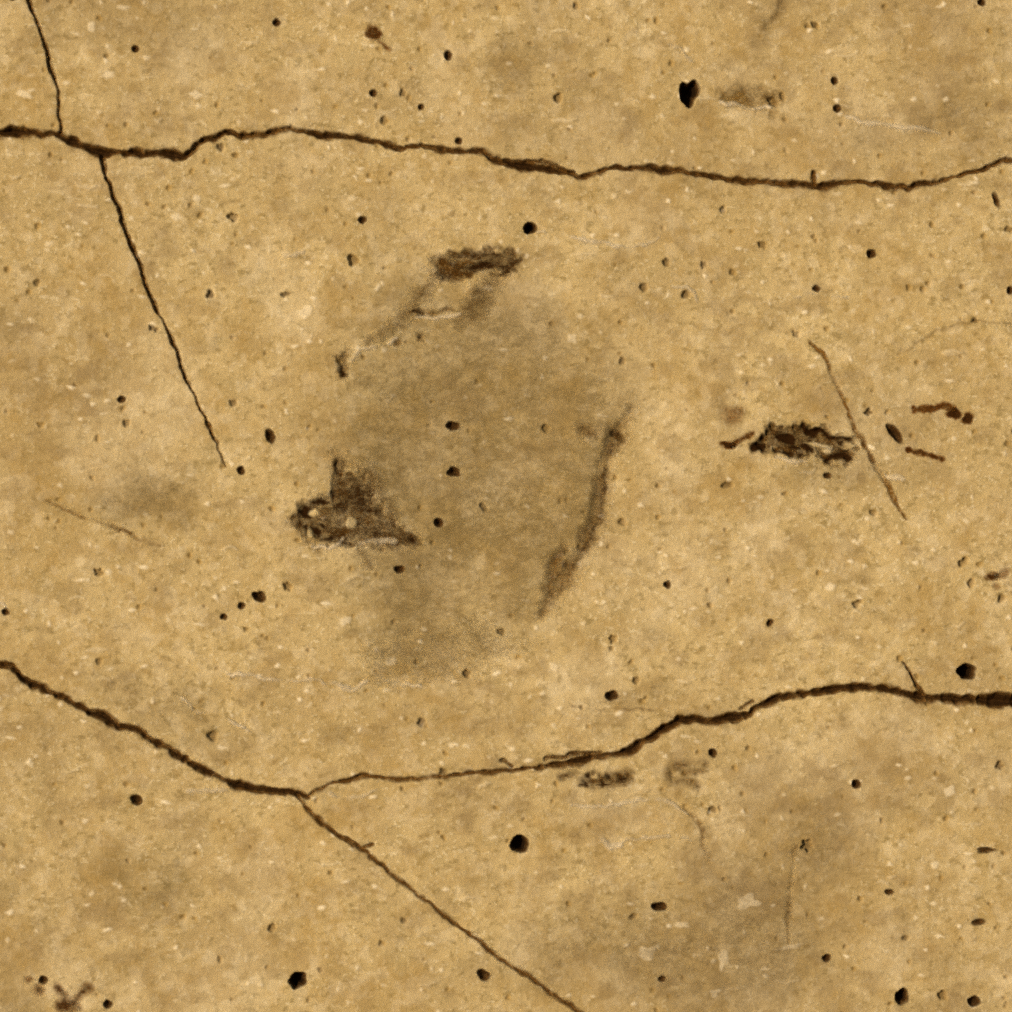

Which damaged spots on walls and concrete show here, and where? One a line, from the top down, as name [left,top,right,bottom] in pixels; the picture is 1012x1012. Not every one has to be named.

spalling [401,246,523,320]
crack [0,0,1012,466]
spalling [292,458,418,550]
spalling [750,422,854,464]
crack [809,341,906,519]
crack [0,661,1012,1012]